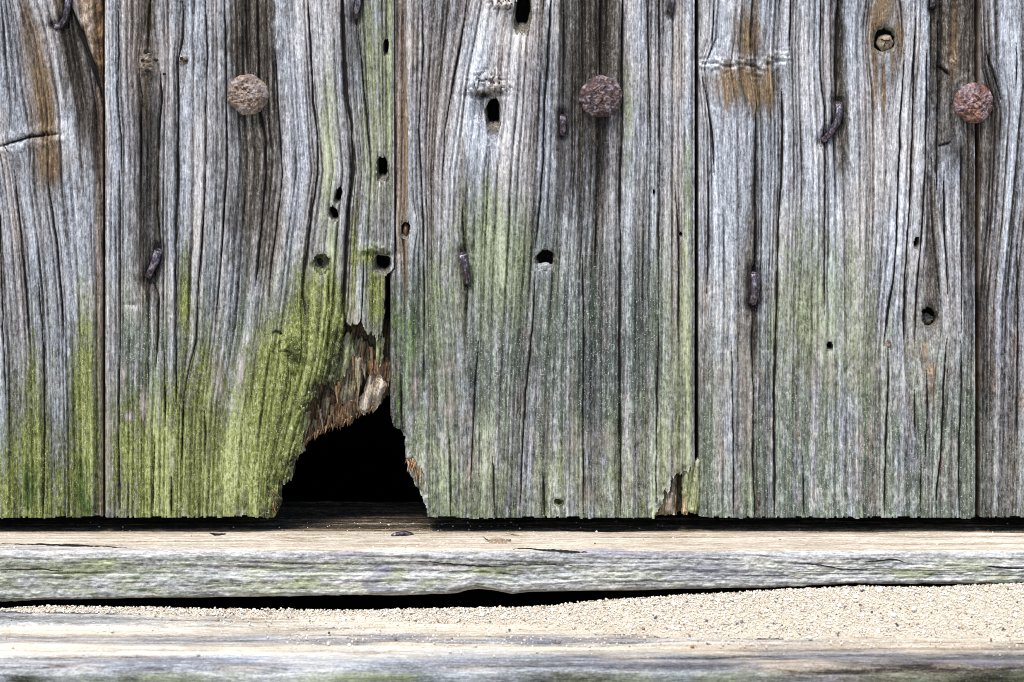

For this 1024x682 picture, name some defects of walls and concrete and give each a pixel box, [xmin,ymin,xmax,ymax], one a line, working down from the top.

crack [4,132,54,152]
corrosion [142,0,151,30]
corrosion [135,78,164,302]
corrosion [217,0,283,278]
corrosion [454,149,467,319]
corrosion [557,0,626,207]
corrosion [725,172,759,455]
corrosion [832,0,849,176]
corrosion [929,0,1001,372]
spalling [266,317,390,519]
spalling [654,457,700,516]